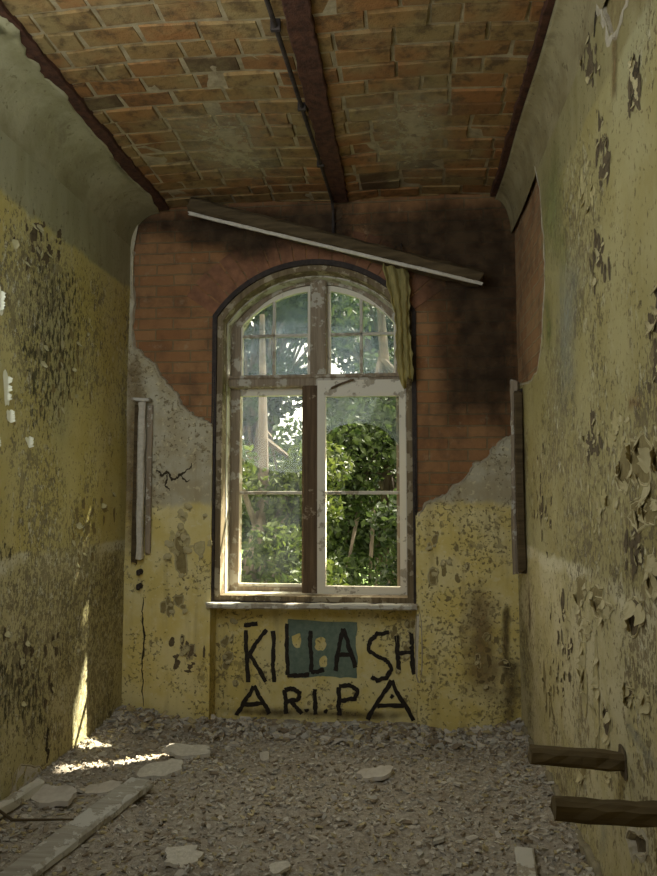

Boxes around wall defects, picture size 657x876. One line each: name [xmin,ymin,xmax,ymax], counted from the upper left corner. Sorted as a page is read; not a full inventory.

water stain [0,640,49,735]
water stain [12,256,90,438]
crack [156,463,192,491]
spalling [129,207,386,426]
spalling [225,166,545,385]
spalling [408,271,511,516]
peeling [542,408,657,750]
spalling [625,827,657,871]